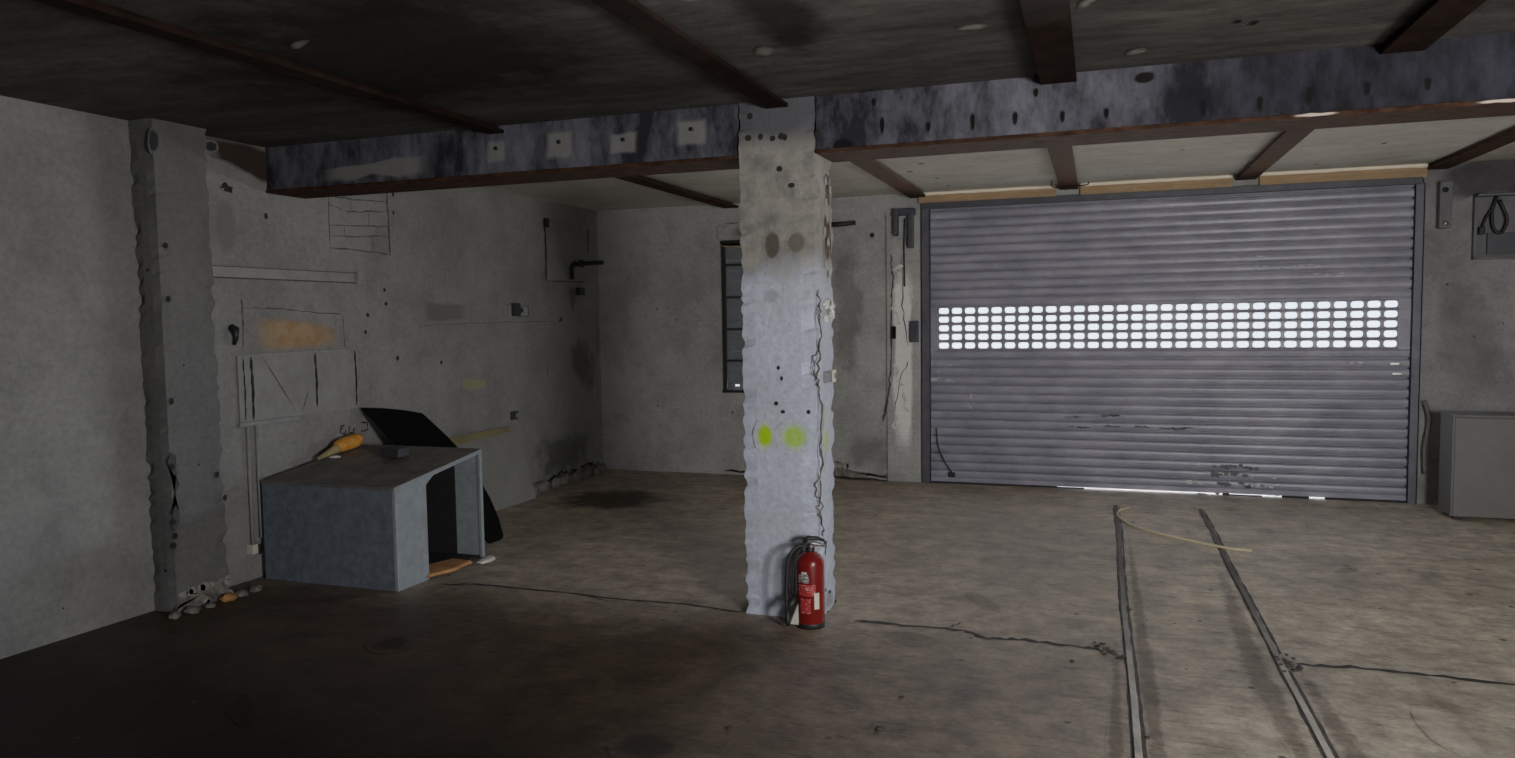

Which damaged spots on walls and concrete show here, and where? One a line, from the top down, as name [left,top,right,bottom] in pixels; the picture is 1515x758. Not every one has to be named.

spalling [824,175,833,268]
spalling [823,299,836,323]
crack [812,289,827,554]
crack [855,620,1100,650]
crack [1296,663,1515,685]